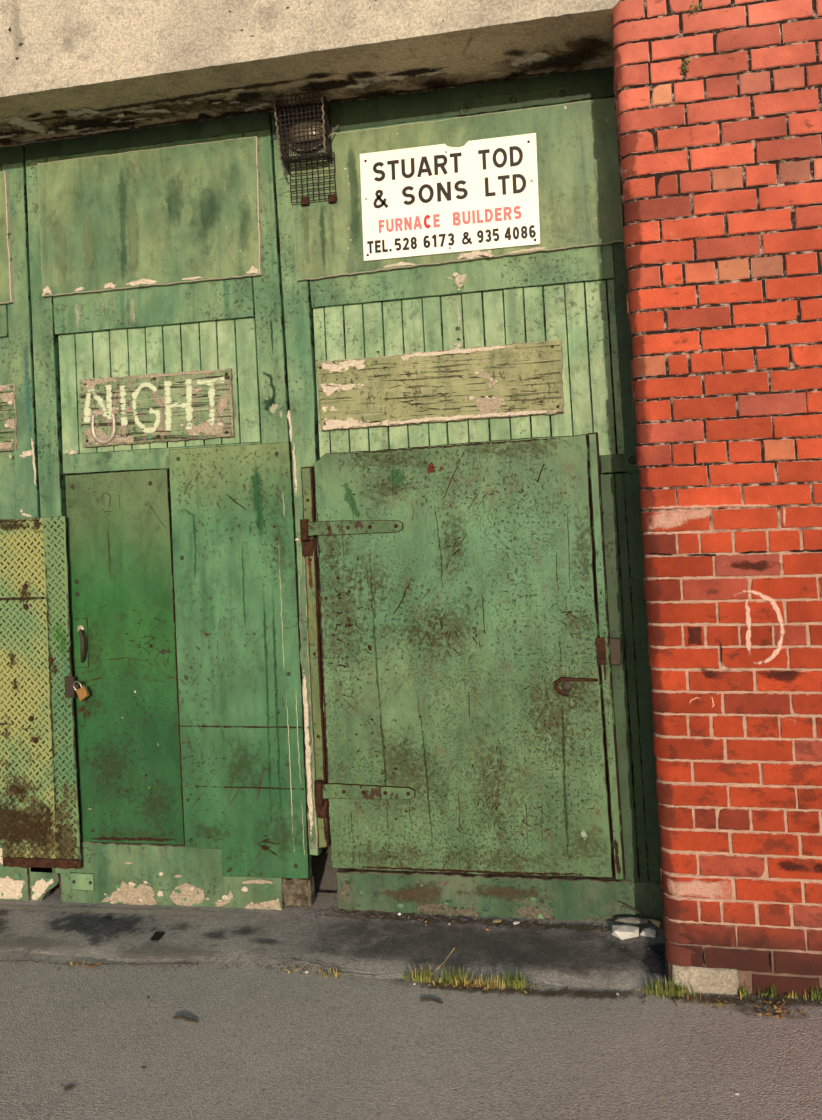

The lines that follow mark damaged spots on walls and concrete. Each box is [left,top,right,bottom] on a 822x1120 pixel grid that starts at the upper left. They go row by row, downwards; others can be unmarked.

leakage [9,70,573,145]
peeling [445,250,493,291]
peeling [81,370,220,394]
peeling [320,305,559,430]
peeling [0,385,36,490]
peeling [66,407,154,455]
peeling [181,394,228,437]
corrosion [308,535,406,783]
corrosion [0,552,102,860]
peeling [0,848,53,901]
peeling [101,872,282,910]
corrosion [362,855,597,880]